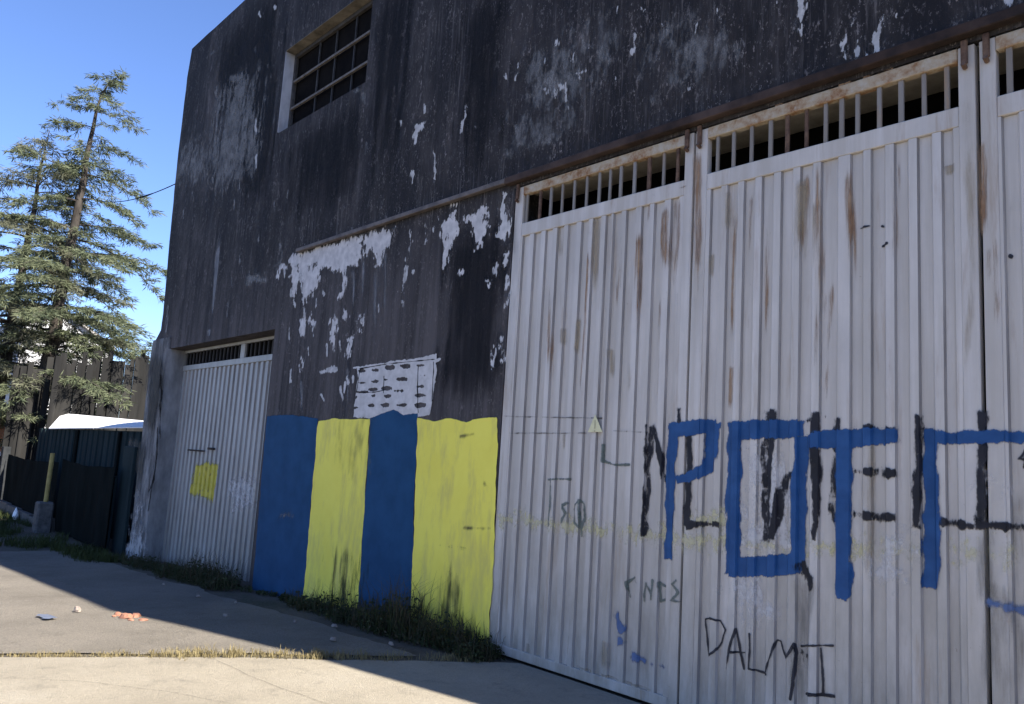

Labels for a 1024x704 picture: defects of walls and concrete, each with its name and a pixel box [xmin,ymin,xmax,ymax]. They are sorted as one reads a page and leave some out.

water stain [178,10,276,190]
peeling [412,104,426,146]
water stain [212,246,220,310]
peeling [401,192,512,308]
corrosion [661,212,679,263]
corrosion [798,176,819,242]
corrosion [846,180,856,254]
peeling [247,226,396,401]
water stain [145,356,163,426]